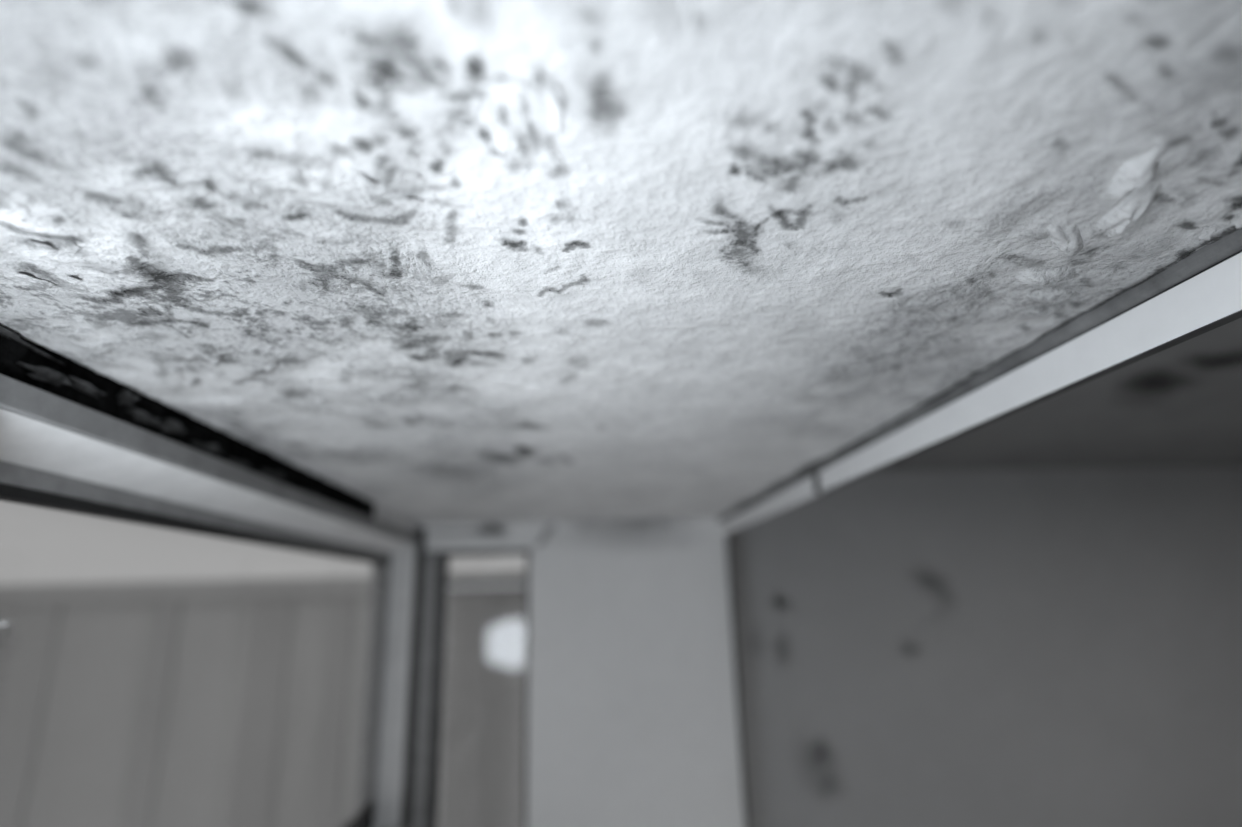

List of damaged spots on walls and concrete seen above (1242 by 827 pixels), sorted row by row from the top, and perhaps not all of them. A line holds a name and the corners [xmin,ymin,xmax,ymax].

water stain [268,43,306,67]
water stain [448,59,488,102]
water stain [351,90,369,110]
water stain [799,111,818,143]
water stain [352,139,372,153]
water stain [141,156,174,187]
water stain [188,181,215,209]
water stain [501,220,526,251]
water stain [708,221,758,246]
water stain [400,336,439,361]